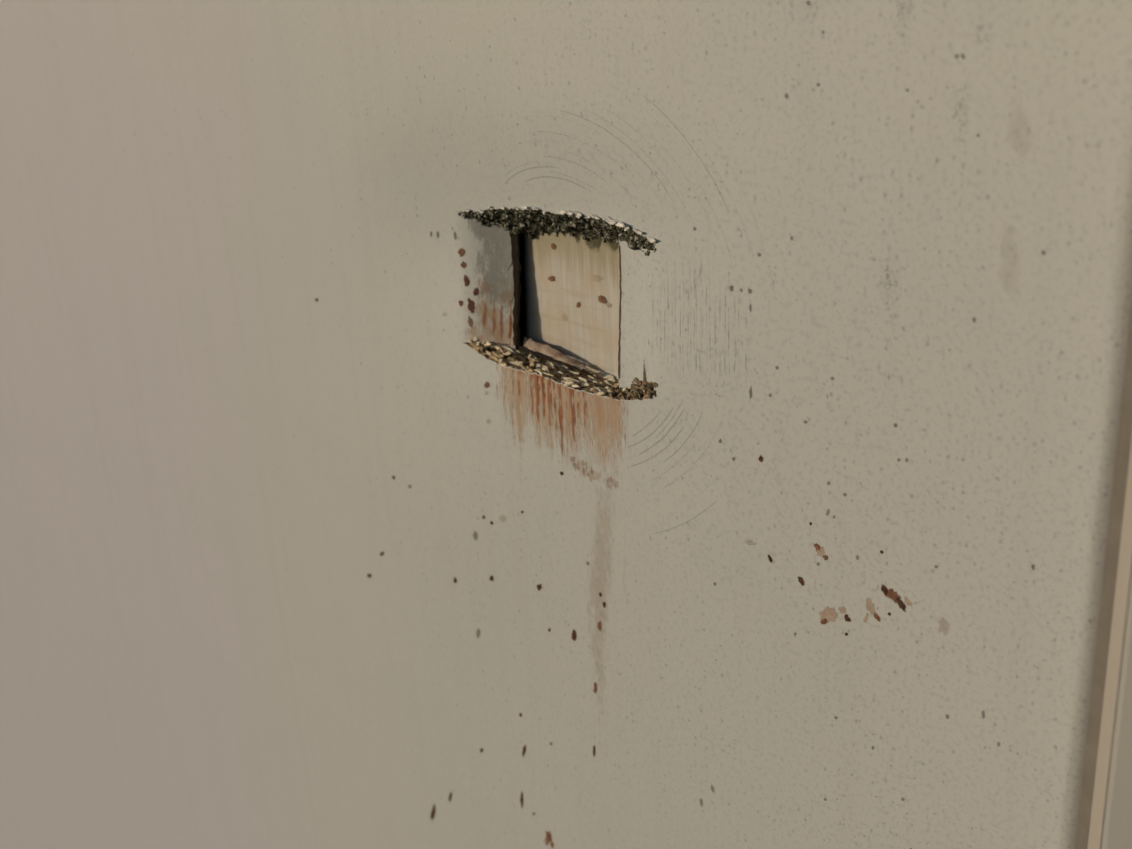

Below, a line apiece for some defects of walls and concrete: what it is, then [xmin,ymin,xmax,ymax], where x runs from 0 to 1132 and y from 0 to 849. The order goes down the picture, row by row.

corrosion [458,248,514,348]
spalling [457,206,658,400]
corrosion [484,364,626,457]